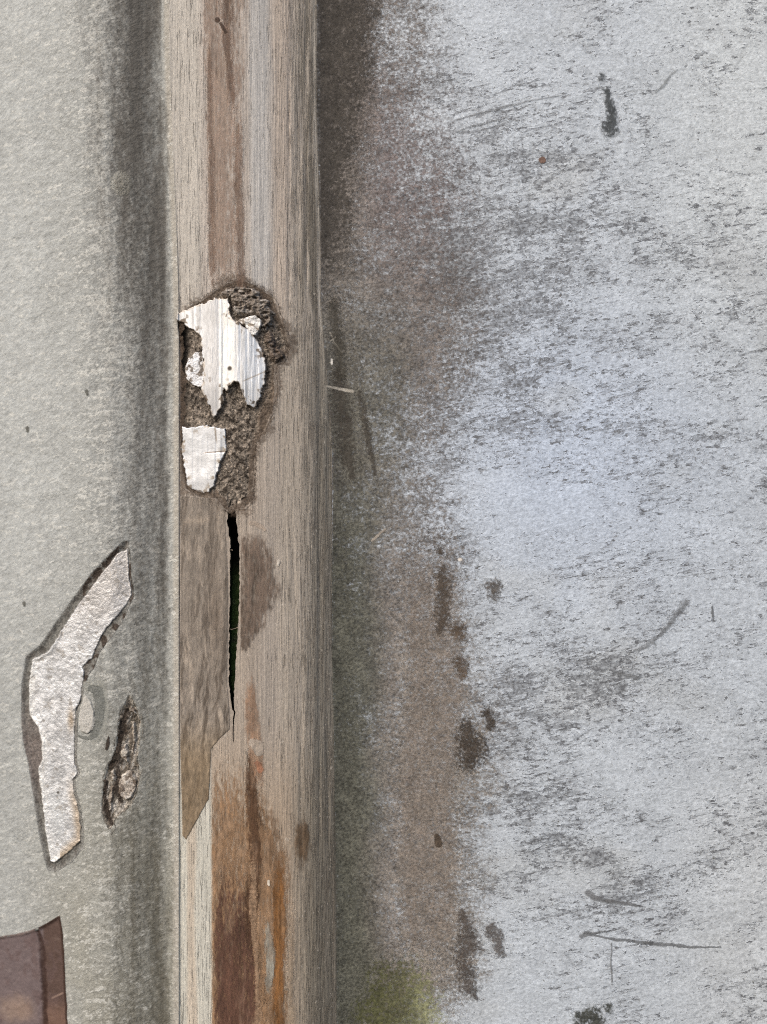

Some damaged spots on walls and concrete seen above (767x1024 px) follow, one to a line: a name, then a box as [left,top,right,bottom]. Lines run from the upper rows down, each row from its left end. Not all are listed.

peeling [21,541,134,872]
spalling [101,692,143,835]
spalling [176,280,290,839]
crack [227,498,240,742]
water stain [240,537,280,651]
rust [212,686,309,1024]
water stain [316,0,506,1024]